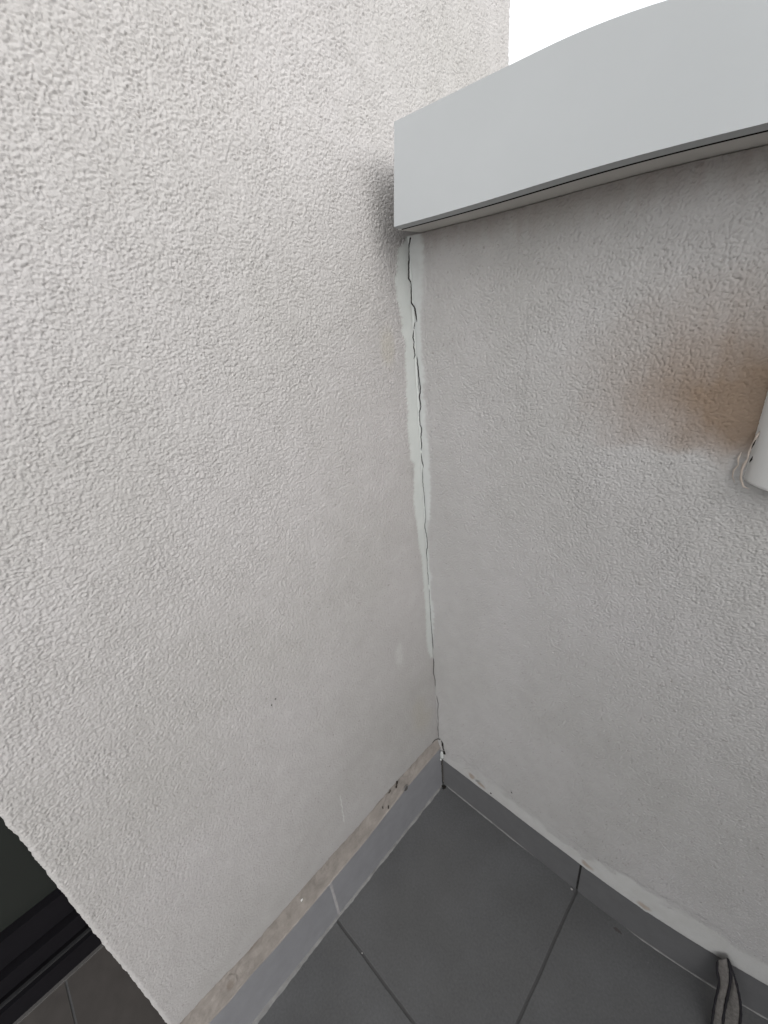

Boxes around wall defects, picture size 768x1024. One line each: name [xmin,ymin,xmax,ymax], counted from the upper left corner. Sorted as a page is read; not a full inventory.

crack [408,237,438,701]